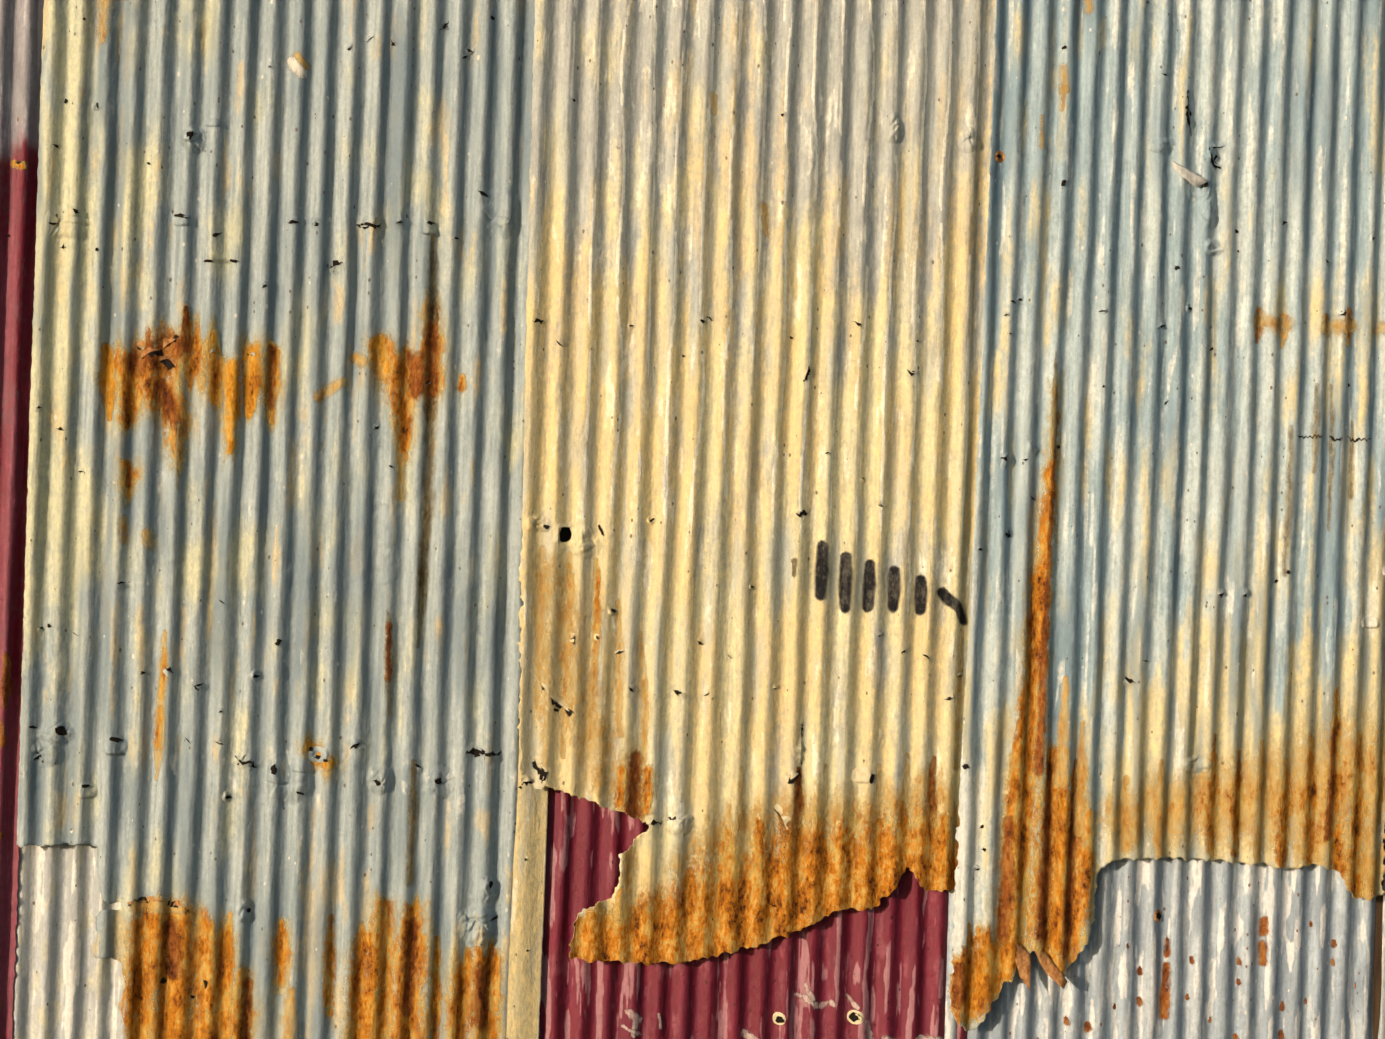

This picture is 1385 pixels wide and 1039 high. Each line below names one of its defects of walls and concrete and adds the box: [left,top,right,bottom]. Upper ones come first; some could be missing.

corrosion [98,304,284,488]
corrosion [315,378,347,401]
corrosion [350,222,466,648]
corrosion [385,612,393,715]
corrosion [950,352,1385,1033]
corrosion [569,628,962,966]
corrosion [121,896,259,1039]
corrosion [272,919,297,1039]
corrosion [322,760,504,1039]
peeling [794,982,896,1039]